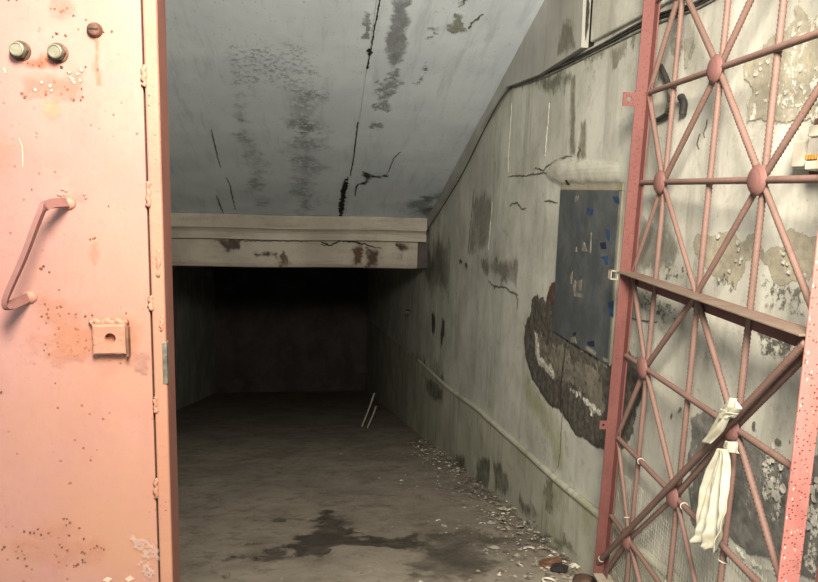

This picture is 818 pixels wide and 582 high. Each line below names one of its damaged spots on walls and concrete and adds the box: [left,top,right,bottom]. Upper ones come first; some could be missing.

crack [366,0,381,69]
leakage [386,0,411,64]
leakage [372,74,401,112]
crack [350,123,359,176]
crack [509,155,572,177]
crack [488,280,518,310]
peeling [603,0,818,582]
spalling [524,282,612,450]
leakage [477,458,506,494]